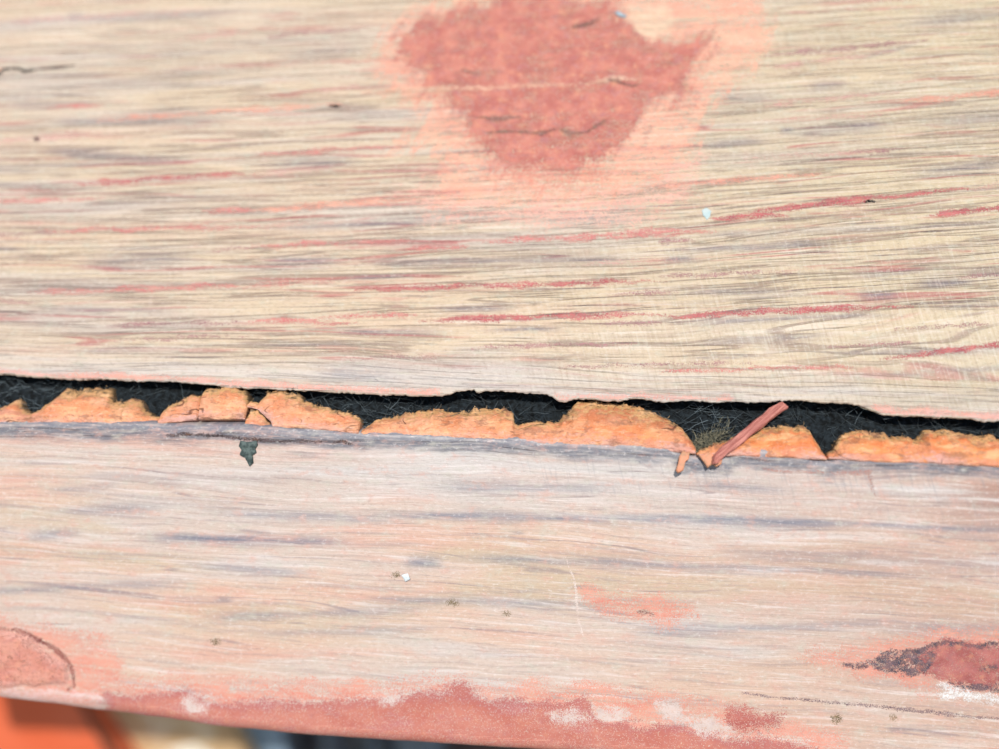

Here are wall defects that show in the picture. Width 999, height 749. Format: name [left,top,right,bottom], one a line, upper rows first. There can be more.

crack [0,65,74,74]
peeling [259,144,402,156]
peeling [207,238,468,253]
peeling [353,181,999,297]
peeling [106,303,914,343]
peeling [471,341,637,350]
crack [166,432,351,446]
peeling [793,620,999,706]
peeling [0,610,850,749]